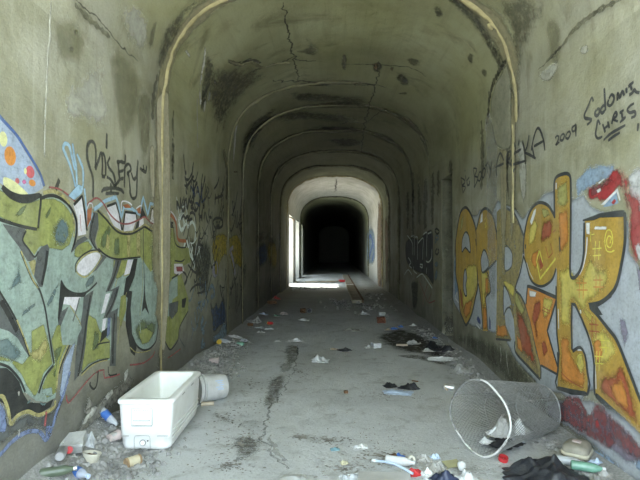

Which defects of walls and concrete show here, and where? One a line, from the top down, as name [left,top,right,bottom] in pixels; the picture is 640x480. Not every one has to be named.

crack [75,1,138,61]
crack [273,3,330,86]
crack [540,0,621,68]
damp [210,58,290,122]
damp [449,0,541,259]
damp [150,0,234,371]